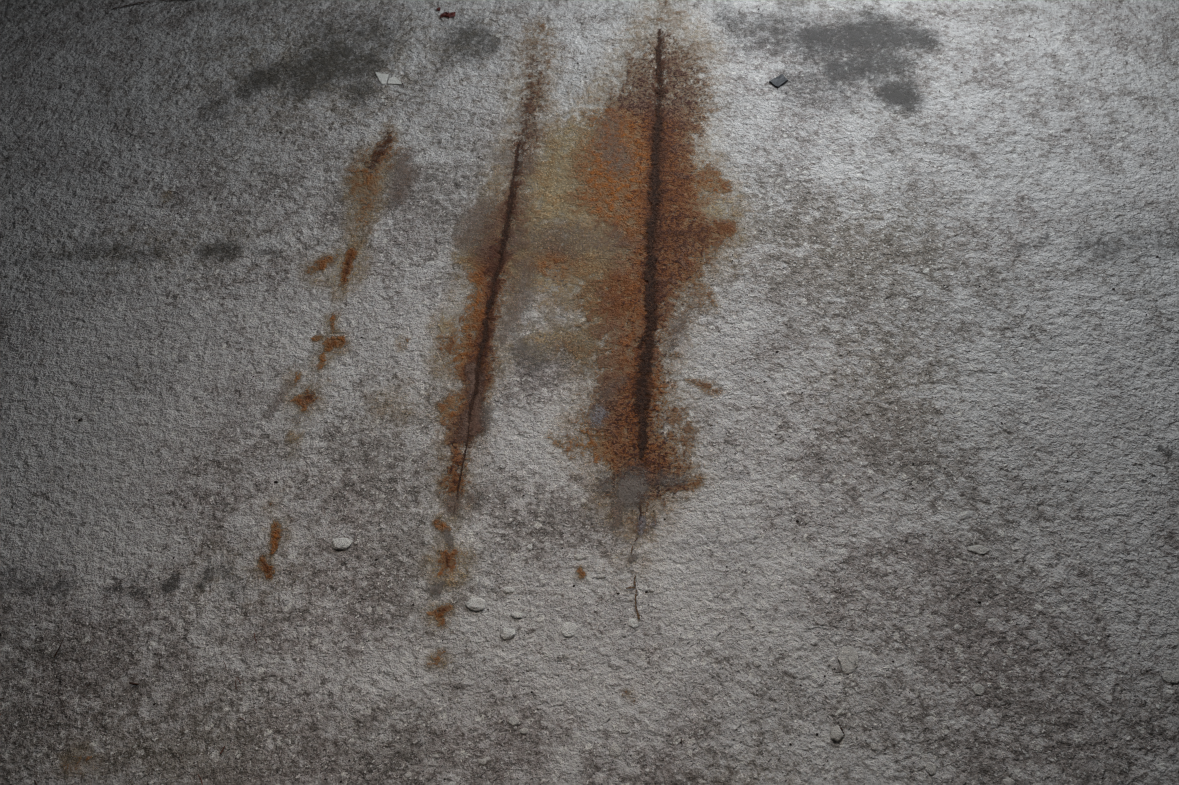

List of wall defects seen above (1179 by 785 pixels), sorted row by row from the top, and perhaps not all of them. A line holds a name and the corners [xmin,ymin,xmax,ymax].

corrosion [270,312,349,412]
corrosion [305,125,418,298]
crack [453,141,521,512]
corrosion [428,0,744,587]
crack [632,0,666,458]
corrosion [256,519,283,580]
corrosion [426,603,454,627]